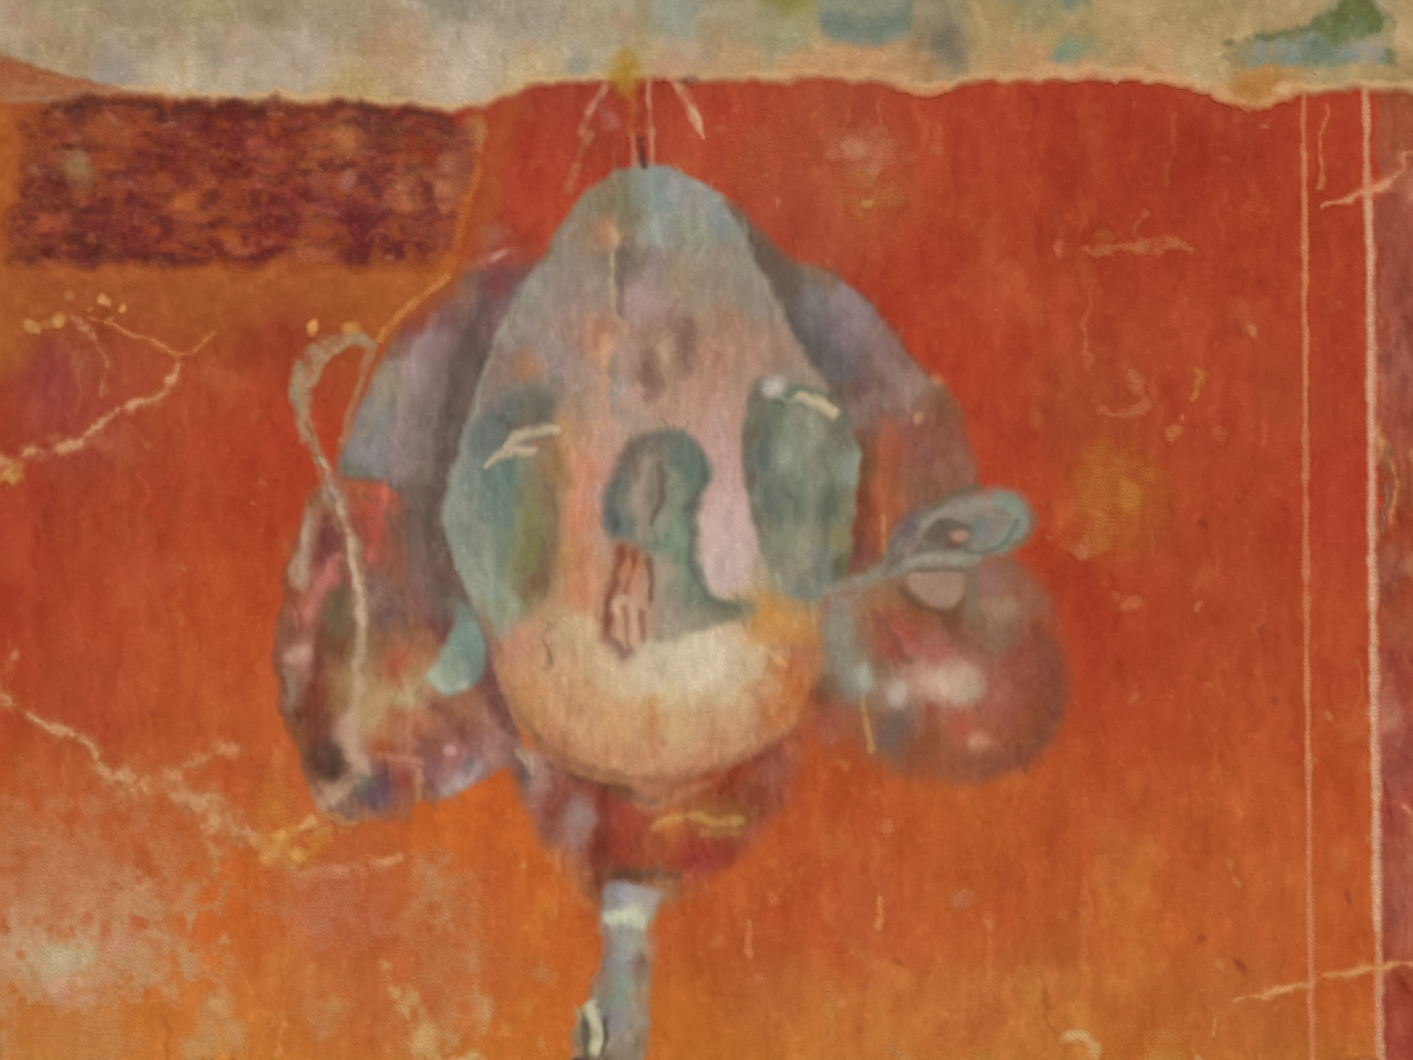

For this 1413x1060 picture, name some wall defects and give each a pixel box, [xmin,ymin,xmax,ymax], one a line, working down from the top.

flaking render [1265,0,1413,105]
flaking render [0,0,1326,340]
crack [1312,98,1413,213]
crack [0,308,221,495]
crack [0,639,417,891]
crack [1207,951,1413,1040]